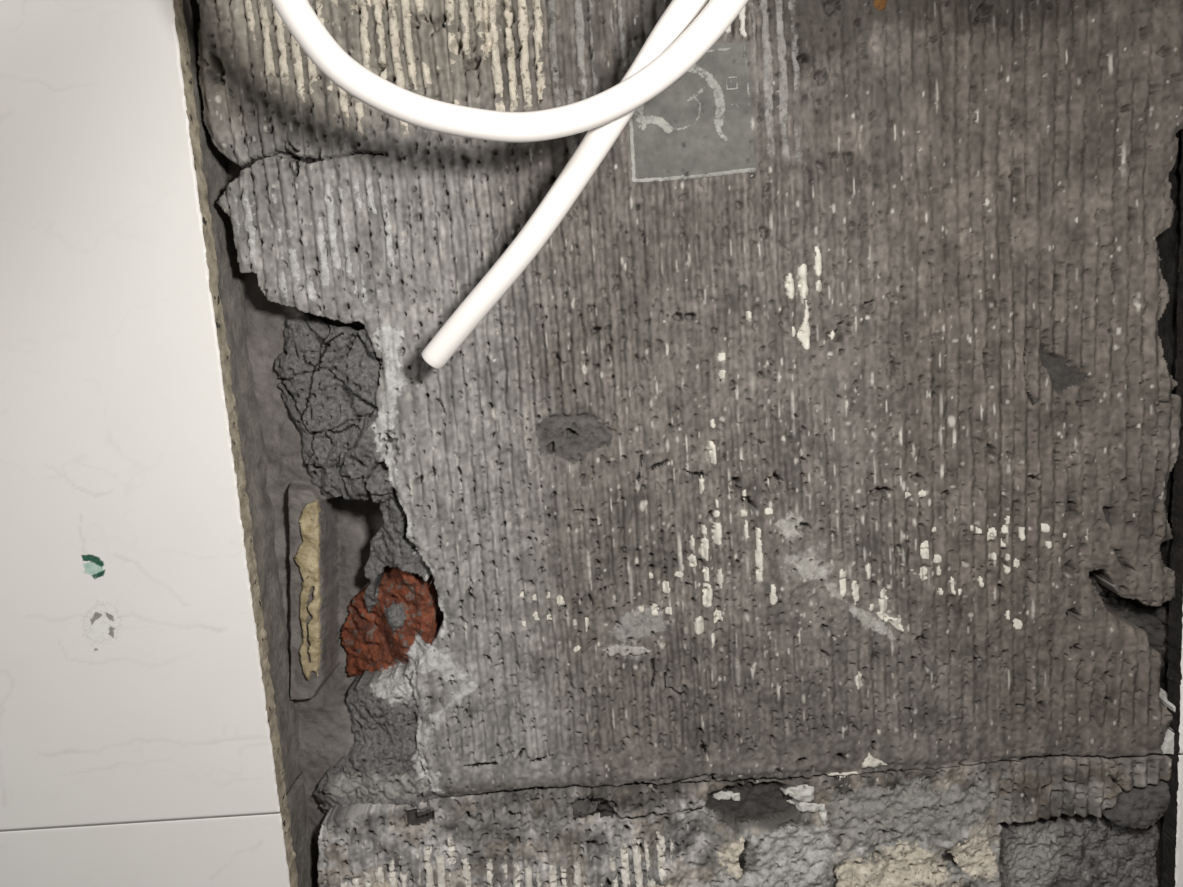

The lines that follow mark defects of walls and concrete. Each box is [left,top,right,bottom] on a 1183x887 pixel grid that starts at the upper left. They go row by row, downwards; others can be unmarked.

crack [241,151,384,176]
spalling [275,313,443,827]
spalling [1089,572,1169,669]
peeling [1158,688,1176,712]
peeling [1161,727,1174,755]
peeling [826,752,887,778]
spalling [571,796,616,818]
spalling [705,781,828,825]
spalling [998,814,1160,887]